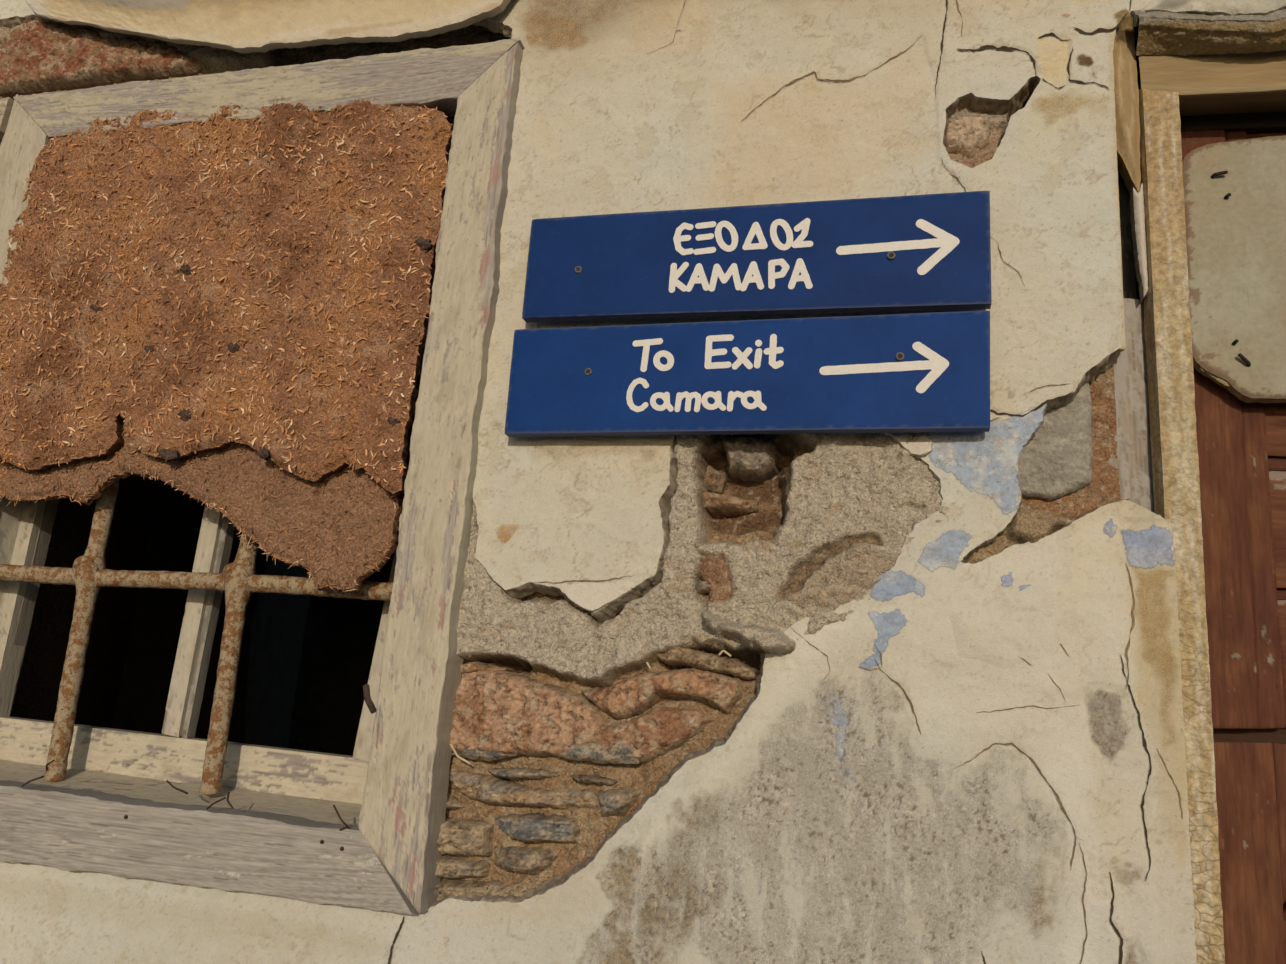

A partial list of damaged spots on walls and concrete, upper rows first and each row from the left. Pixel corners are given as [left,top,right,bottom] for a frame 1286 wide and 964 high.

spalling [0,20,511,100]
crack [741,0,1131,121]
spalling [945,98,1030,168]
crack [990,383,1073,421]
spalling [434,364,1175,964]
crack [976,644,1077,713]
crack [1120,564,1183,881]
crack [959,742,1123,964]